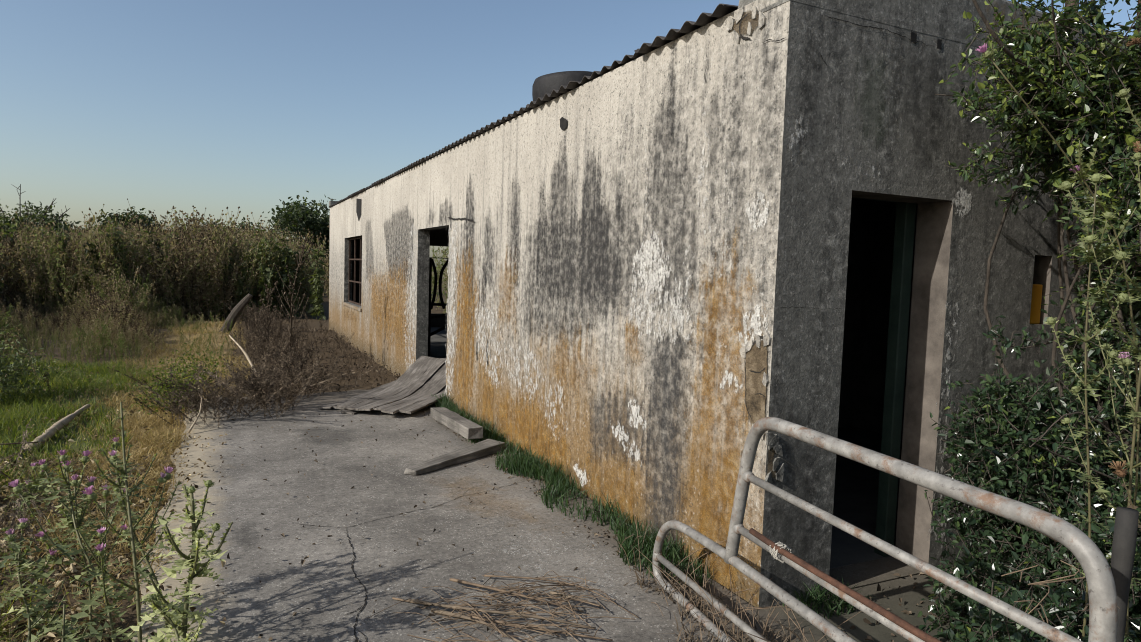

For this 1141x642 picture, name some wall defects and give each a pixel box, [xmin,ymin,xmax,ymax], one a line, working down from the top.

leakage [384,208,414,281]
leakage [508,110,695,339]
rust [693,251,752,576]
spalling [720,257,784,483]
crack [302,480,526,642]